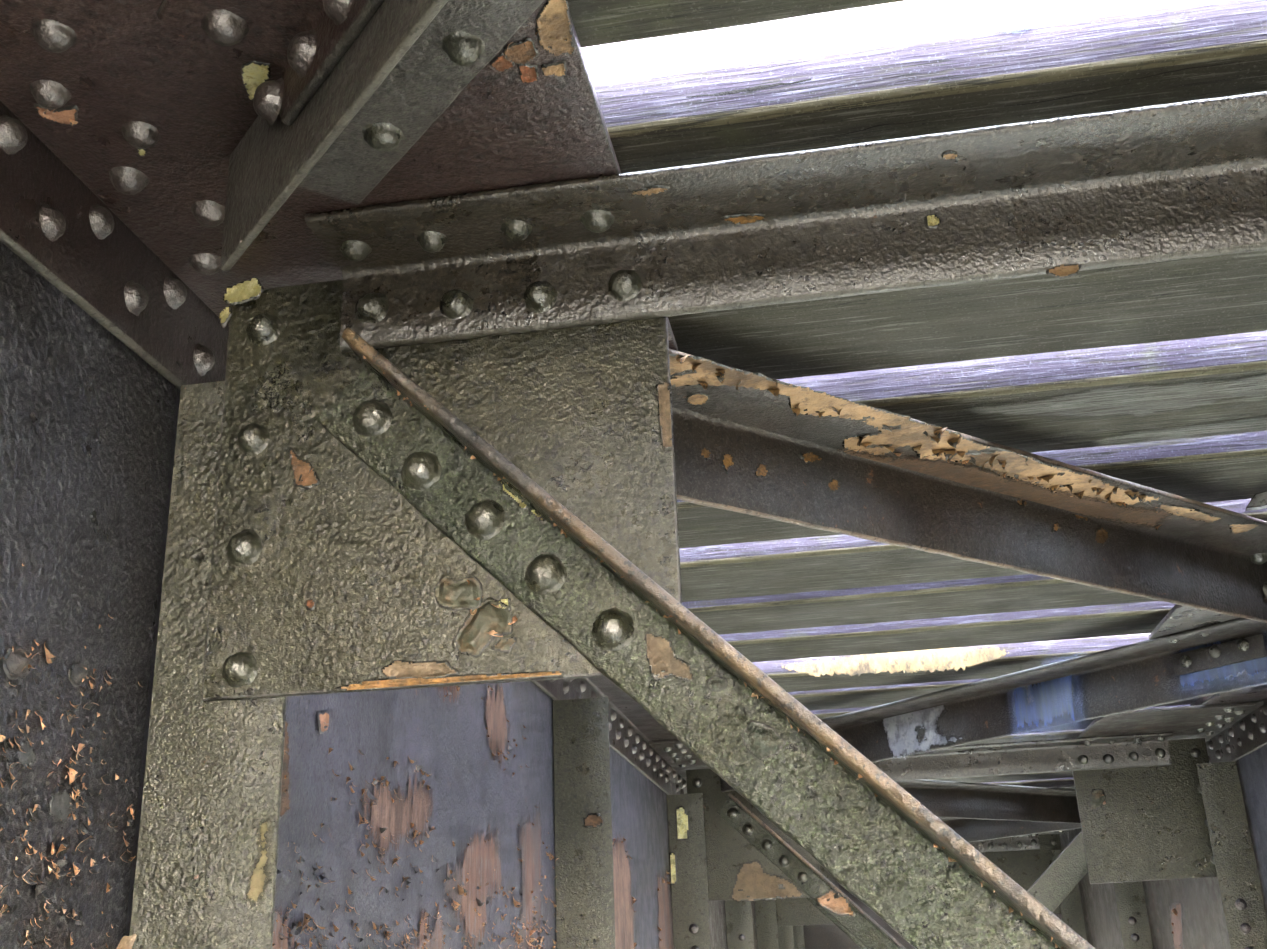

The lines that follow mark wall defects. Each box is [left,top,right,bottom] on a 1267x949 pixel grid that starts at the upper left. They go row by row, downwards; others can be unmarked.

peeling [503,0,575,76]
peeling [655,353,1261,534]
peeling [280,720,290,819]
peeling [318,711,329,734]
peeling [481,683,530,777]
peeling [272,750,559,949]
peeling [730,860,856,917]
peeling [1169,902,1184,949]